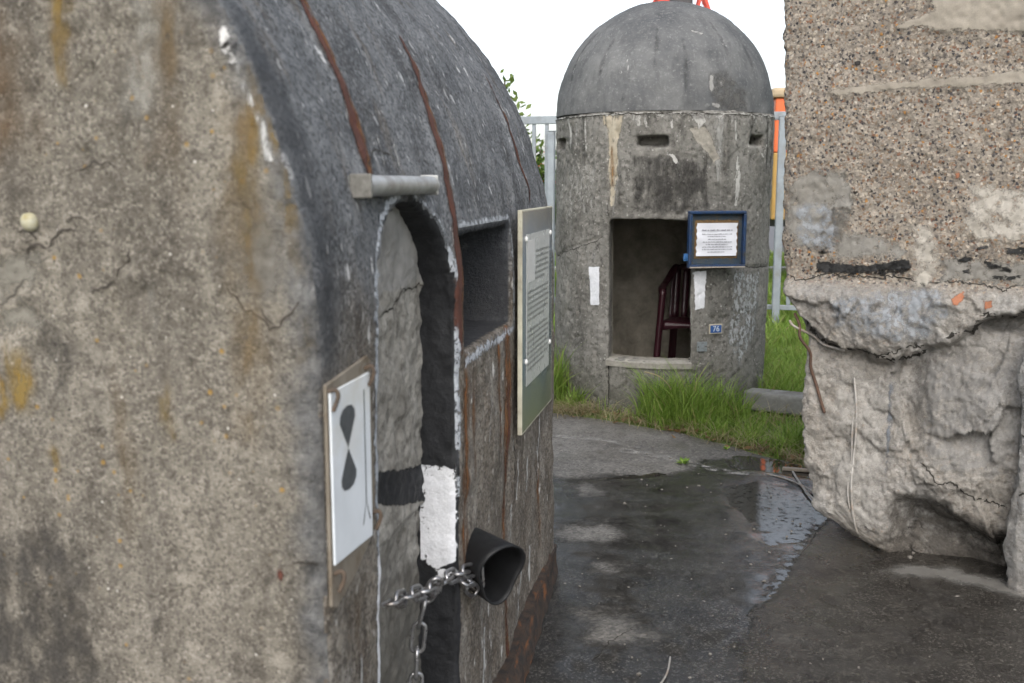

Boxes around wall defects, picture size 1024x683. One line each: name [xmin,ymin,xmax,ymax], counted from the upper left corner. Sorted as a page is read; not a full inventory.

rust [300,0,372,174]
rust [399,36,464,349]
crack [0,217,85,305]
crack [91,248,131,294]
crack [227,287,299,331]
crack [921,463,1024,508]